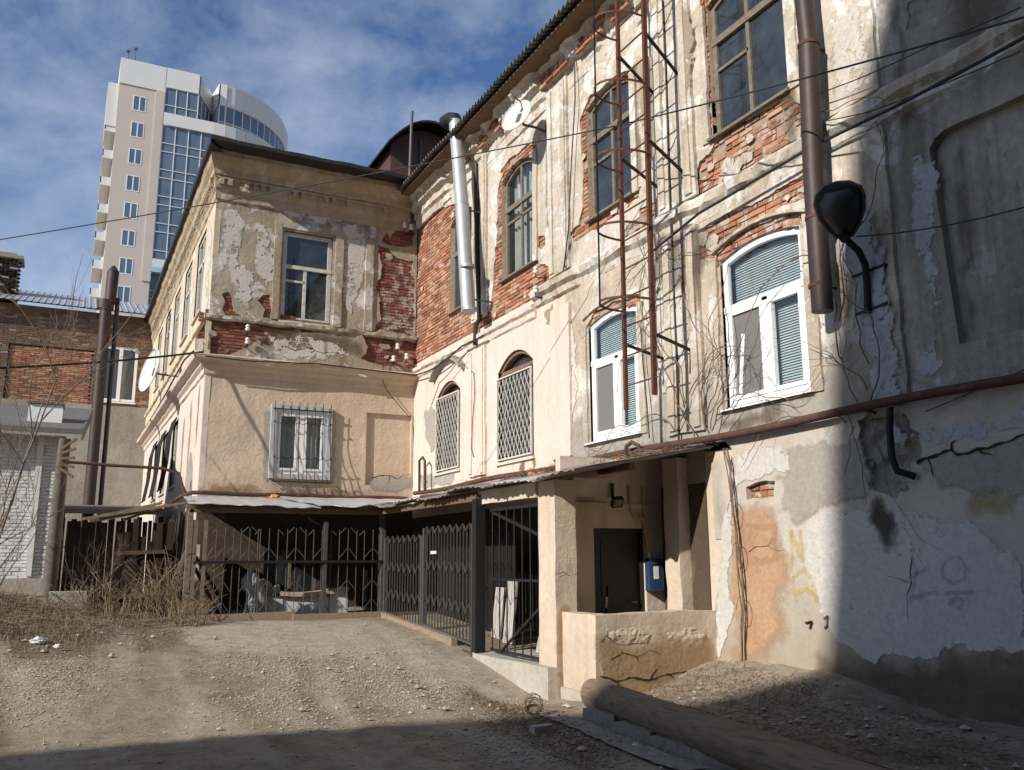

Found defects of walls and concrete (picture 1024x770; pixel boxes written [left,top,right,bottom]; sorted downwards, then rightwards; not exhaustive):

flaking render [195,209,349,369]
flaking render [284,144,551,369]
flaking render [571,94,658,242]
flaking render [611,0,801,209]
flaking render [698,177,804,267]
peeling [911,154,941,309]
crack [601,631,687,685]
peeling [666,505,734,658]
peeling [727,446,790,499]
water stain [871,500,896,546]
peeling [805,211,1024,665]
crack [916,433,1024,478]